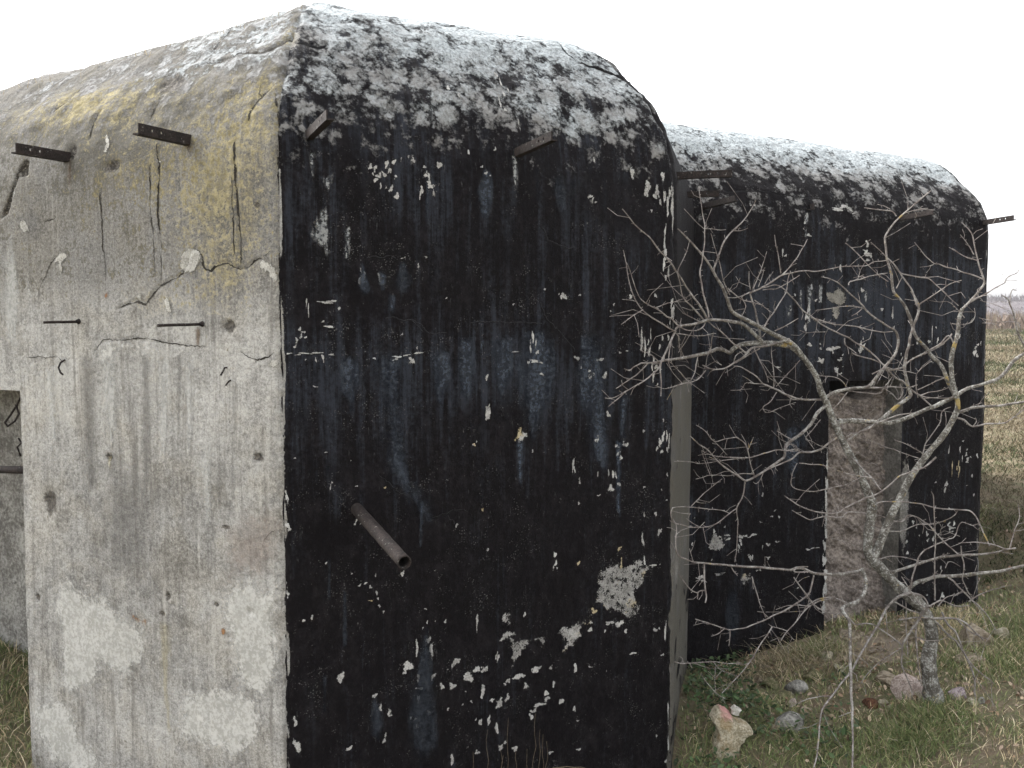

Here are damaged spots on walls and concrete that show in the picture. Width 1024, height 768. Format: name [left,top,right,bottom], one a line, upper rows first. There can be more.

crack [99,140,269,309]
crack [97,337,202,348]
peeling [560,533,661,651]
peeling [402,608,579,752]